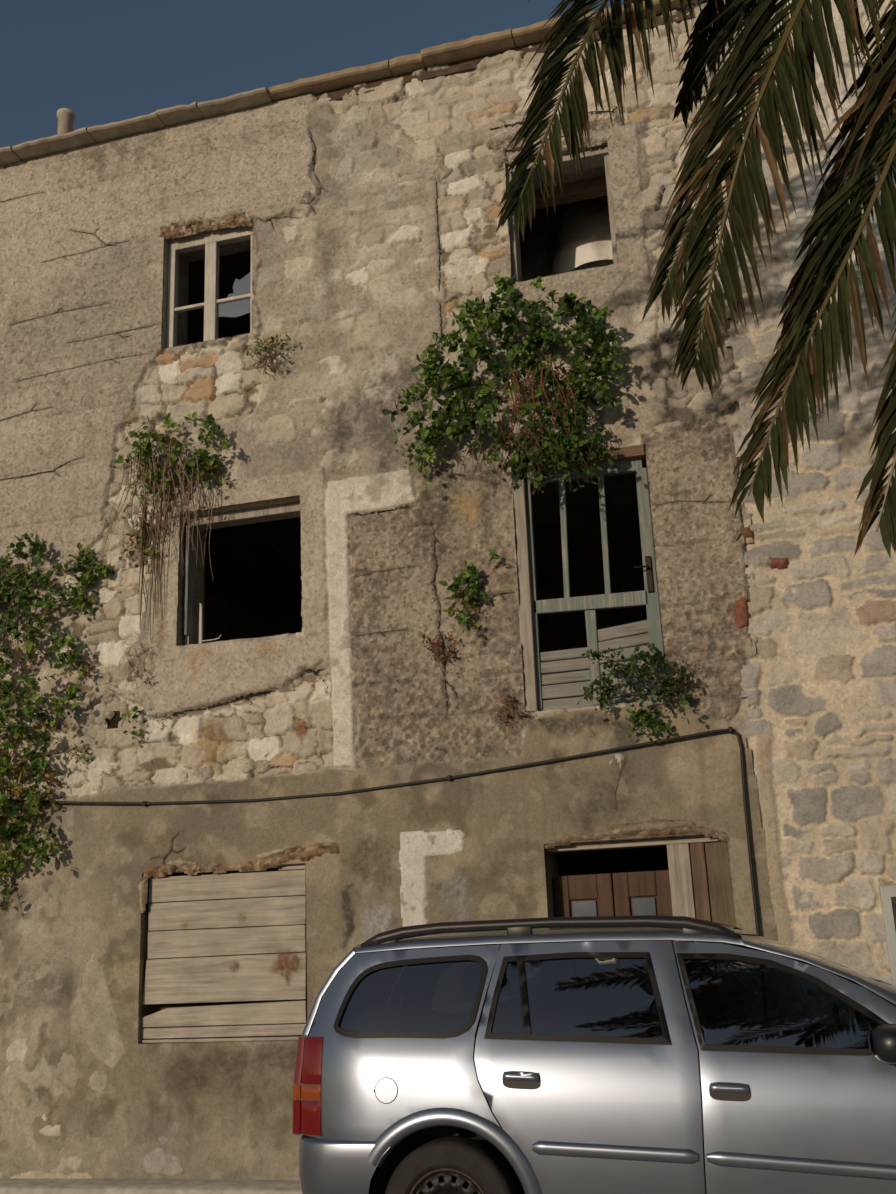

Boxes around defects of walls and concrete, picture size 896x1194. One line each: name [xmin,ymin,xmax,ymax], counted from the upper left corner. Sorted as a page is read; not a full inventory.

crack [254,132,328,229]
crack [41,229,127,263]
spalling [51,336,334,798]
crack [349,505,458,719]
crack [660,457,750,602]
spalling [138,837,343,913]
flaking render [6,1039,29,1074]
flaking render [39,1114,61,1136]